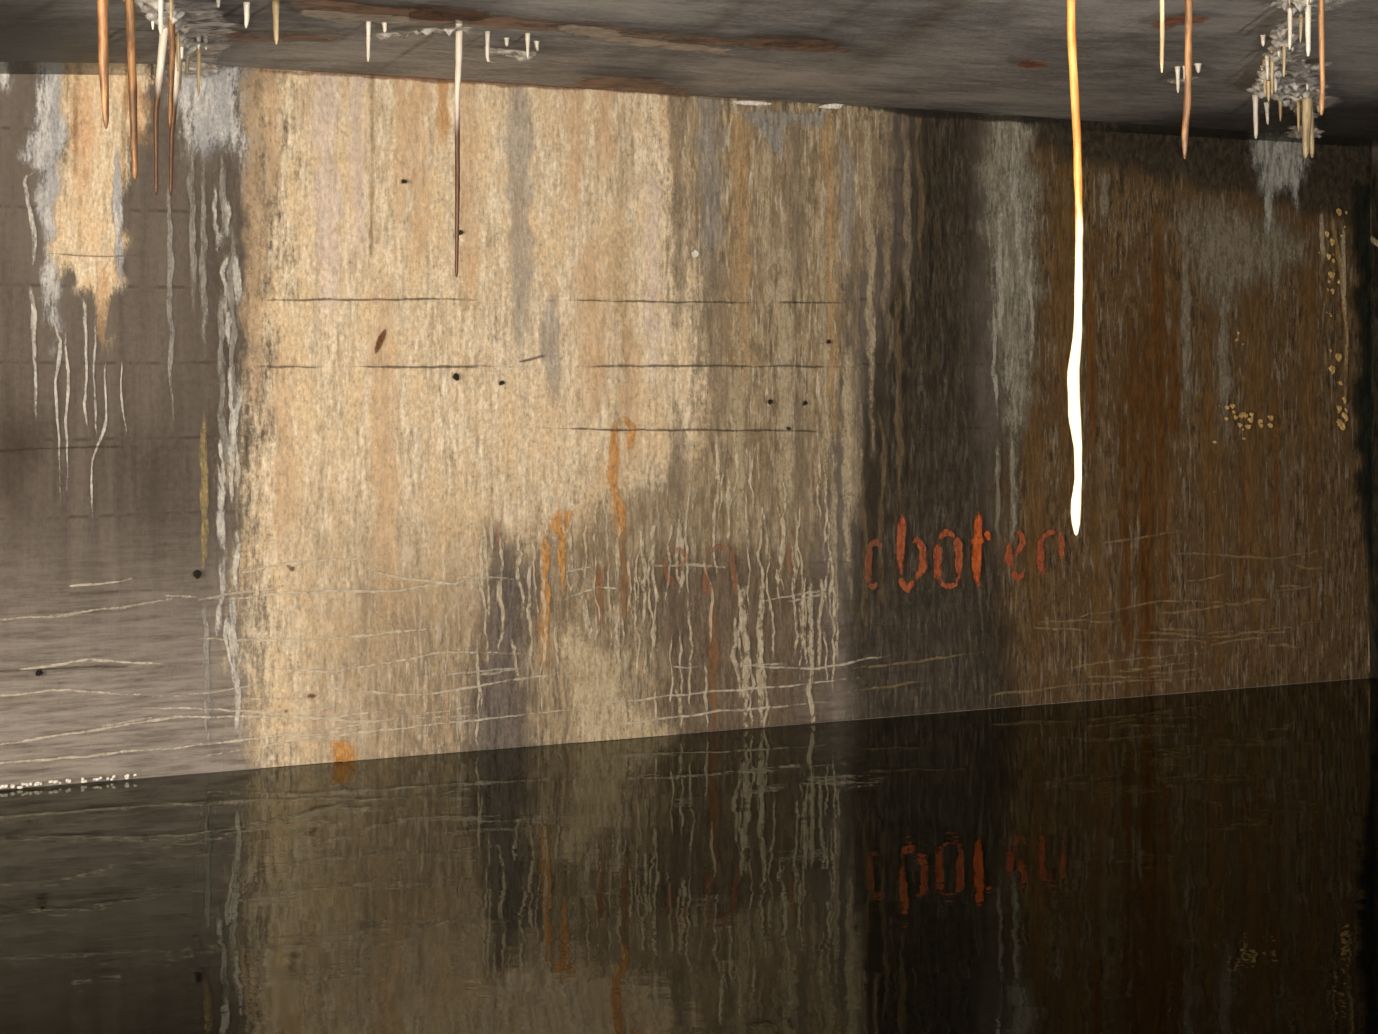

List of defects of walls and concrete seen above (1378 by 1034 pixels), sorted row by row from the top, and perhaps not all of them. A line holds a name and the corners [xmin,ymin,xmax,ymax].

crack [123,0,237,78]
water stain [371,27,474,41]
water stain [483,47,537,62]
rust [280,71,741,99]
rust [186,0,863,54]
rust [1142,17,1209,31]
crack [1246,0,1357,139]
water stain [0,4,153,503]
water stain [166,64,1378,768]
rust [873,107,1369,707]
rust [607,418,635,534]
rust [541,509,571,647]